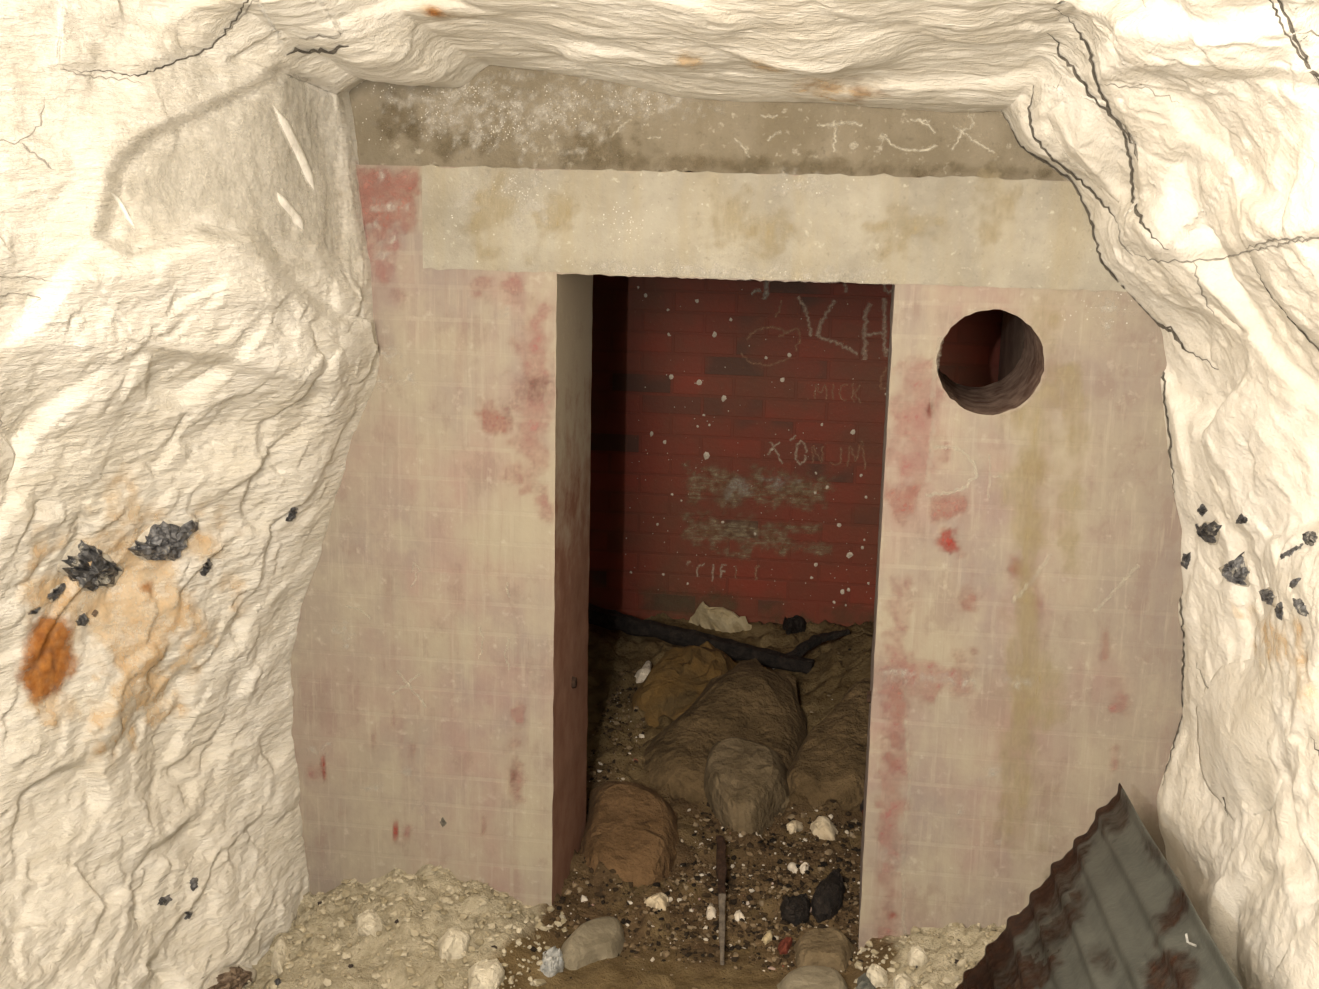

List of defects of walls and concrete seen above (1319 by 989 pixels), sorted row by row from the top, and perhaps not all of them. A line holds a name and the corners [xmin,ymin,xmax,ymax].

crack [0,97,54,170]
crack [60,0,259,83]
crack [286,34,349,55]
crack [1001,0,1319,500]
corrosion [20,542,206,742]
crack [1163,591,1209,783]